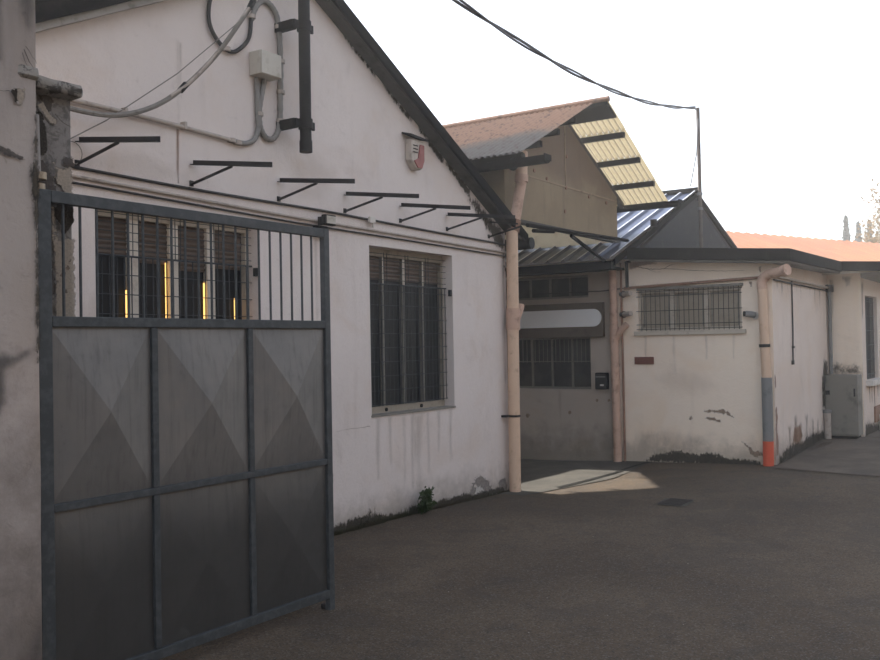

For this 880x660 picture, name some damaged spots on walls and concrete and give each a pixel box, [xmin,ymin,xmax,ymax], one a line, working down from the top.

peeling [36,95,73,193]
peeling [51,204,76,317]
leakage [646,450,761,465]
leakage [779,431,824,463]
leakage [431,487,504,509]
spalling [470,474,507,497]
leakage [334,506,418,534]